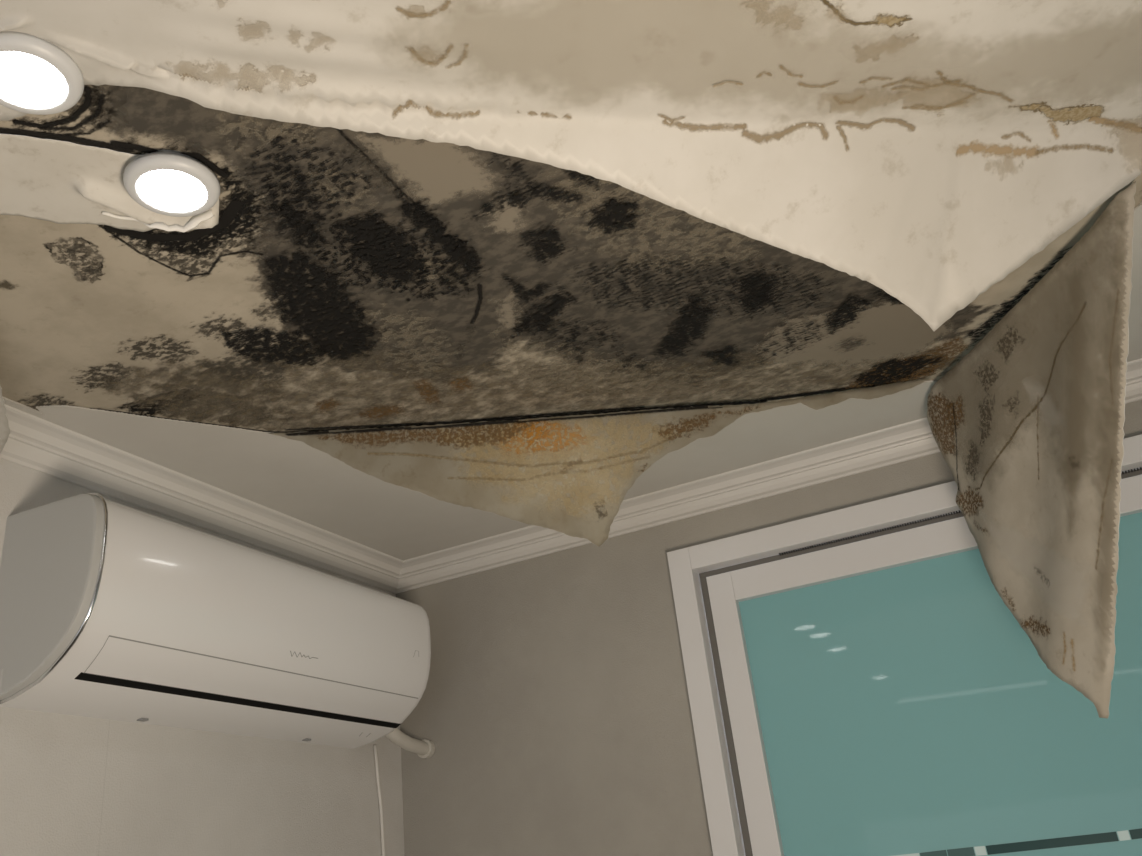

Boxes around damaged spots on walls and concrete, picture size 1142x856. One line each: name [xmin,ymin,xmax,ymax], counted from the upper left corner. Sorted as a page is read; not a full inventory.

leakage [396,1,451,17]
leakage [821,0,912,28]
leakage [410,45,468,67]
leakage [0,84,996,481]
leakage [966,328,1024,480]